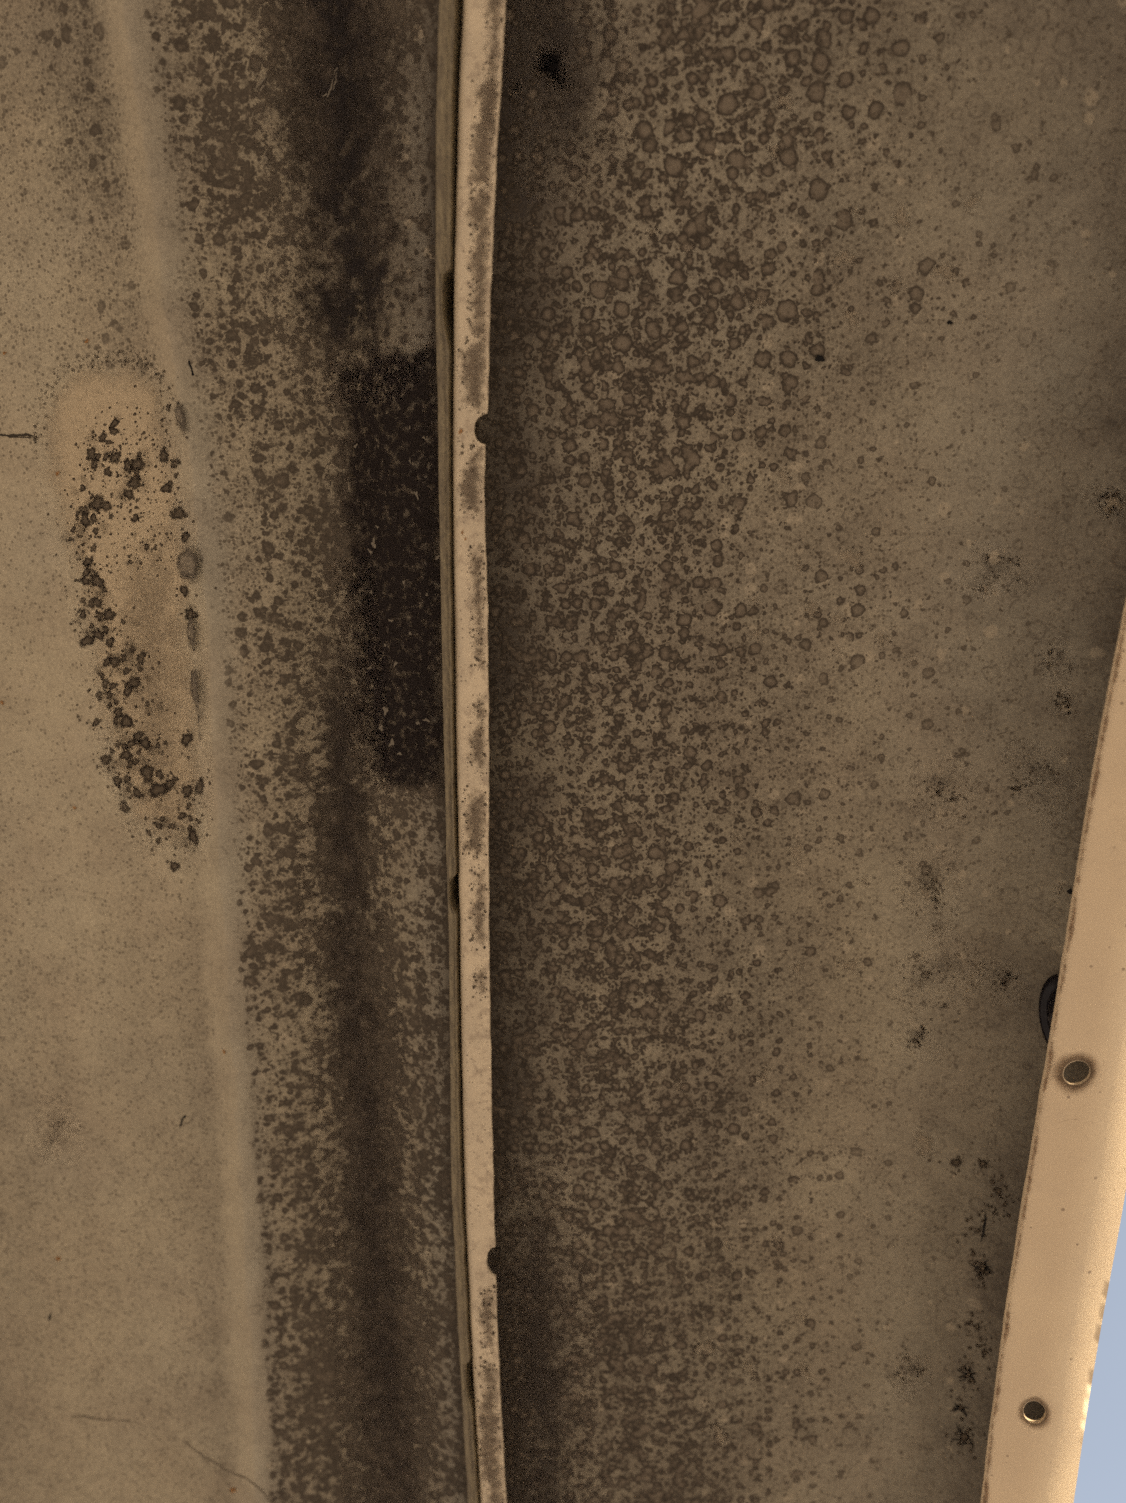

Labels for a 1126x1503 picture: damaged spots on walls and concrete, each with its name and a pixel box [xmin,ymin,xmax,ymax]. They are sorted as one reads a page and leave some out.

water stain [458,0,503,415]
water stain [304,0,444,898]
water stain [458,440,483,519]
water stain [42,375,213,897]
water stain [468,545,486,667]
water stain [461,695,488,1001]
water stain [928,1142,1020,1289]
water stain [475,1285,504,1503]
water stain [939,1311,992,1460]